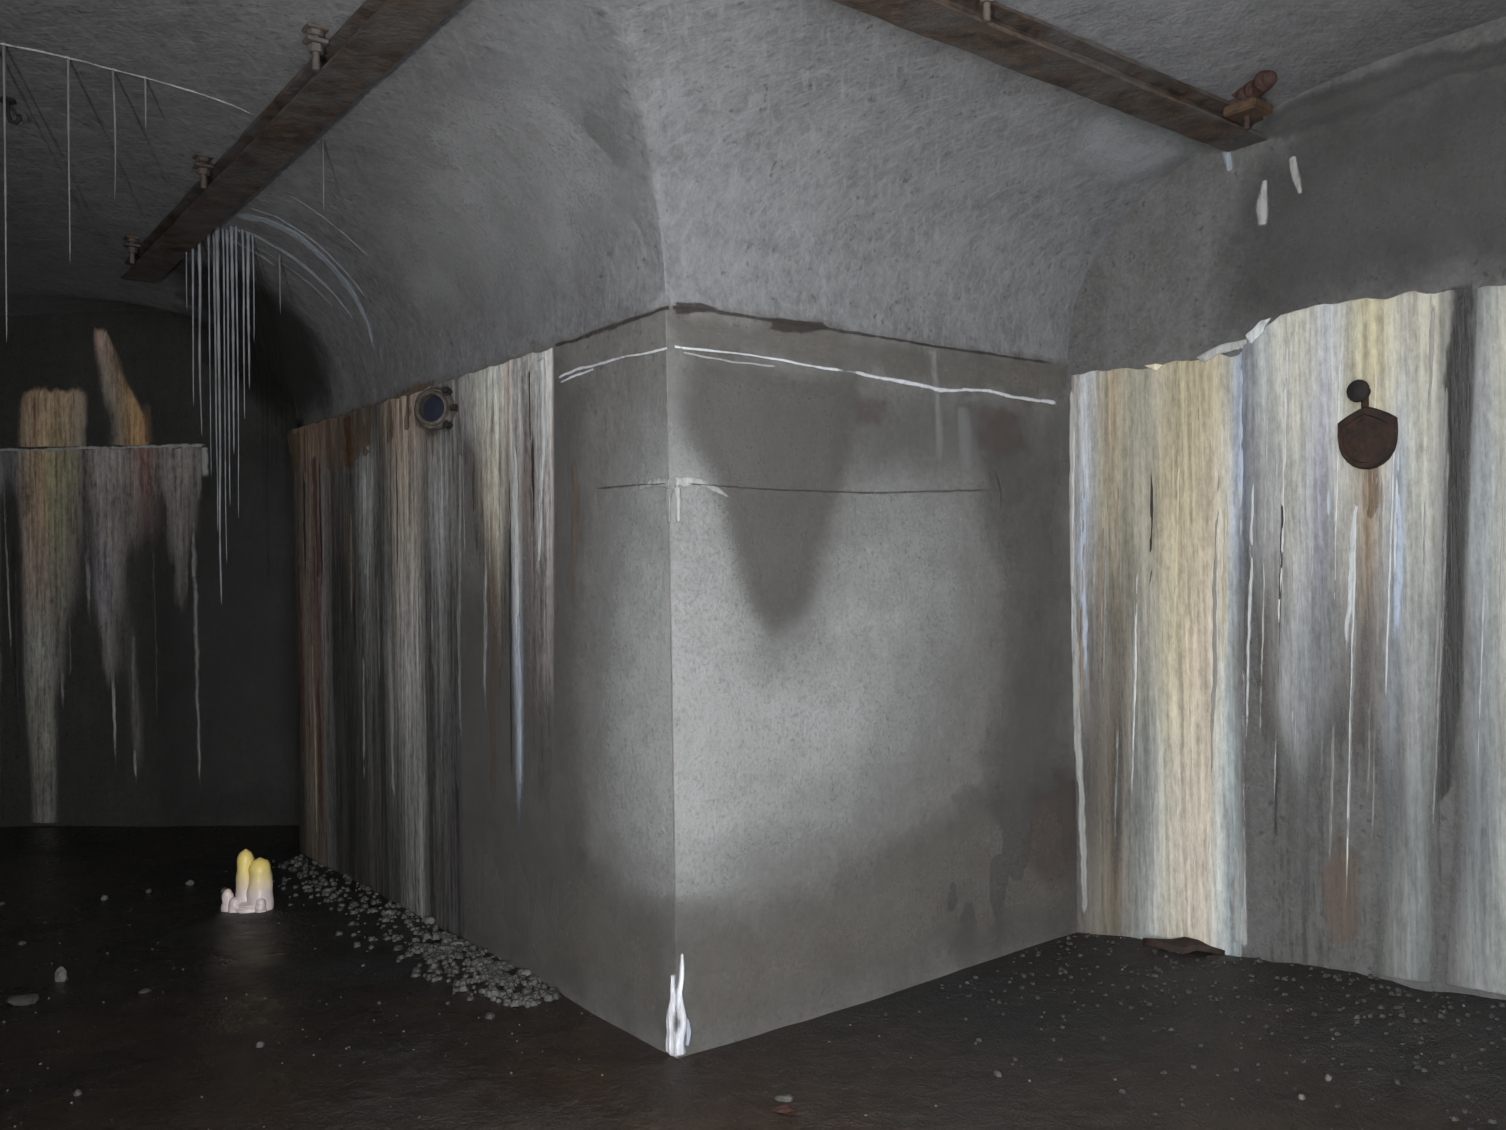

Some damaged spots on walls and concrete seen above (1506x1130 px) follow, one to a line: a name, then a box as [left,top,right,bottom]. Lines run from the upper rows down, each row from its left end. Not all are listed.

leakage [220,208,373,344]
leakage [0,264,661,1014]
leakage [370,15,627,325]
leakage [599,365,965,913]
crack [556,302,1055,405]
leakage [666,42,1506,1056]
corrosion [1367,468,1378,518]